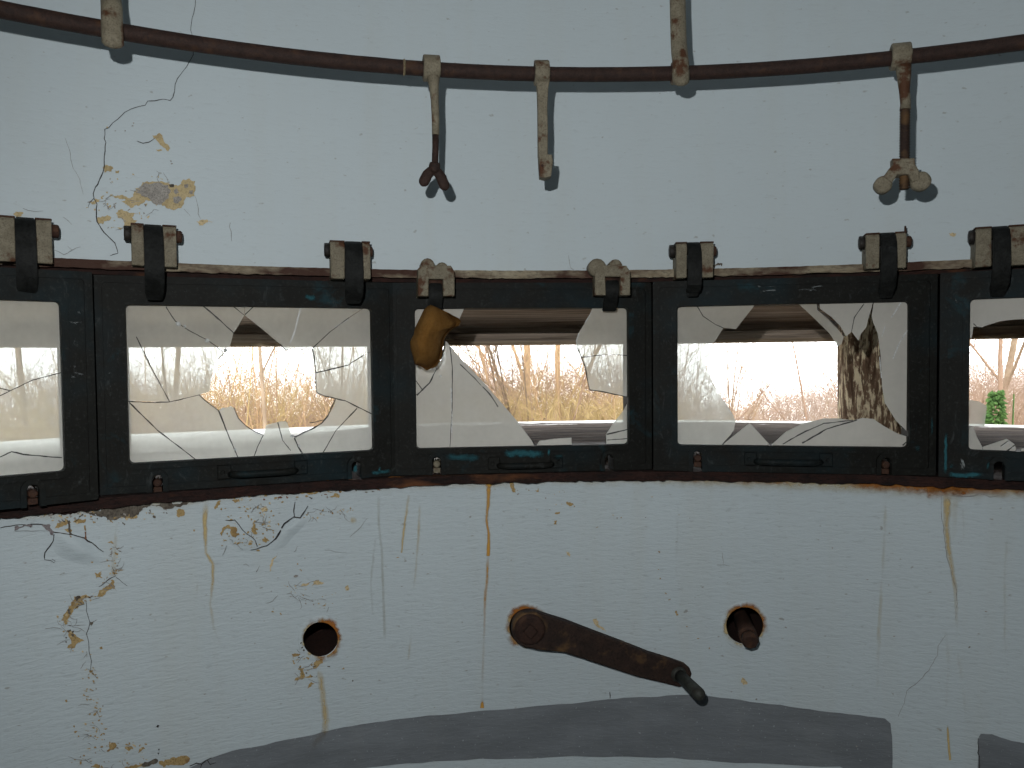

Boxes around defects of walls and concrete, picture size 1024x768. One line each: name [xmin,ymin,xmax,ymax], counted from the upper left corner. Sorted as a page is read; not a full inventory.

crack [65,0,196,256]
peeling [86,133,196,230]
crack [0,518,127,678]
peeling [57,541,190,768]
rust [203,512,214,576]
crack [227,503,308,572]
peeling [214,490,353,554]
rust [484,484,492,600]
rust [744,436,1024,554]